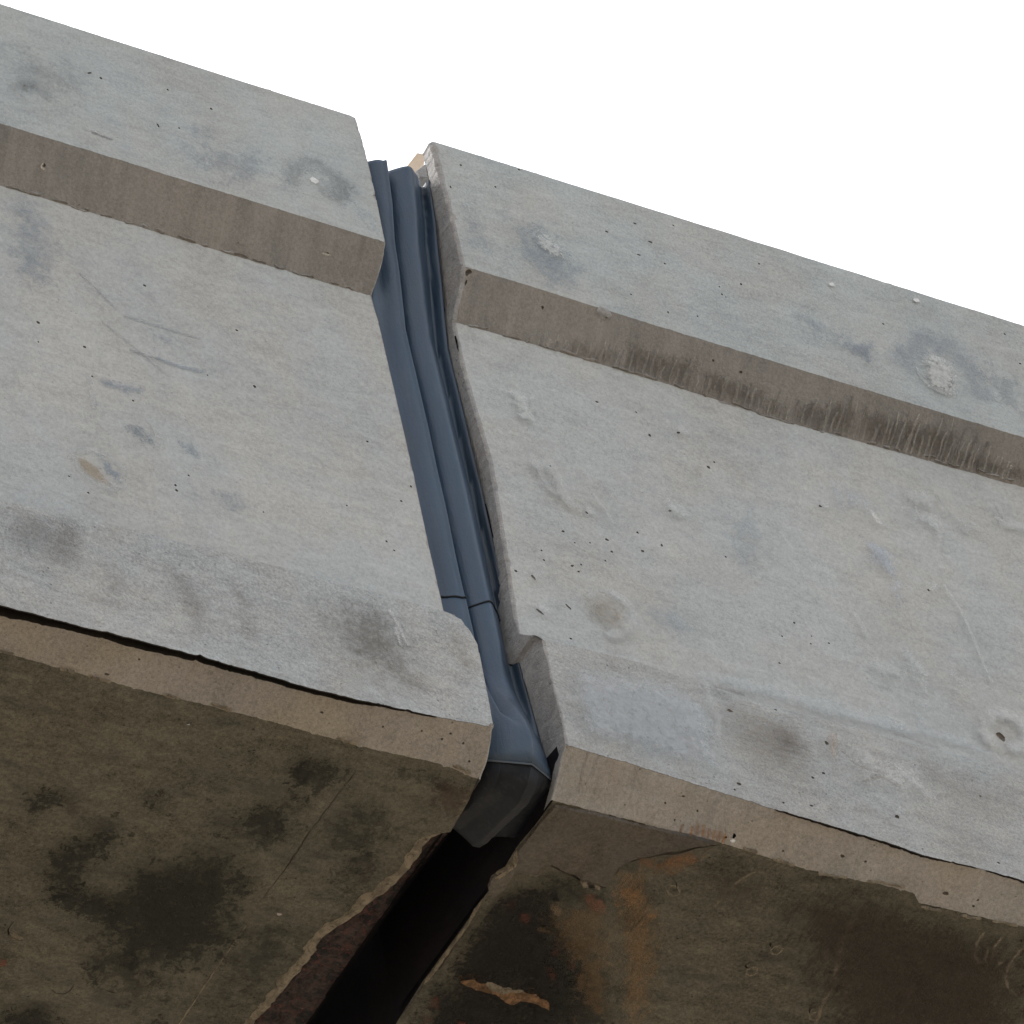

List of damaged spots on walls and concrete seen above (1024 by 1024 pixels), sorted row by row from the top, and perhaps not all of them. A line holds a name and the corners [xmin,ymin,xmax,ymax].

water stain [43,812,257,1003]
spalling [244,833,447,1024]
peeling [400,804,736,1019]
crack [551,845,717,888]